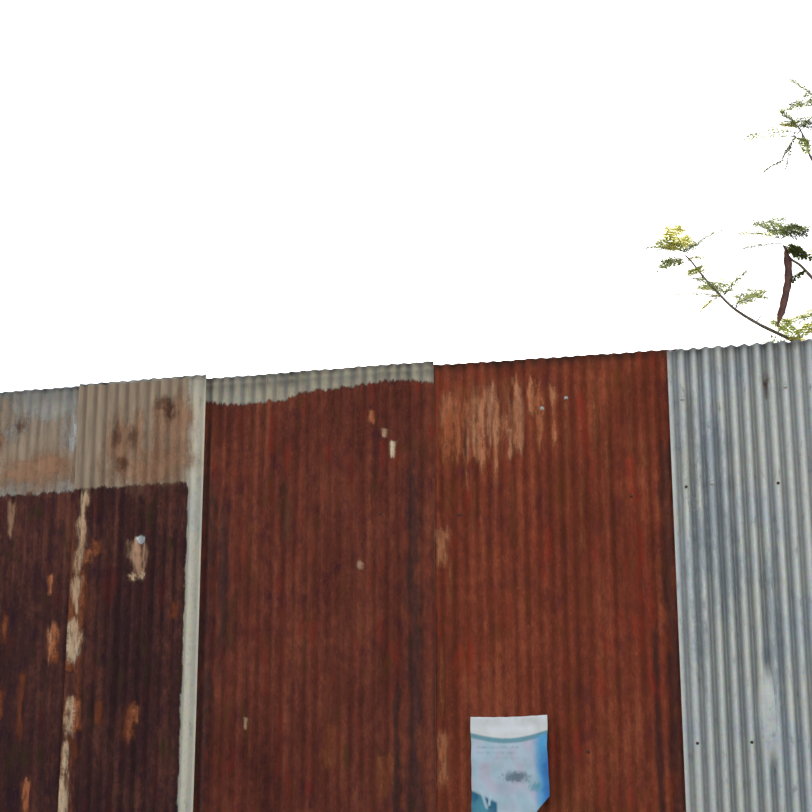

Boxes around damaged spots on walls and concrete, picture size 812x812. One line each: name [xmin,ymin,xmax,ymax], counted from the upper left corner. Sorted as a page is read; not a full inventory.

corrosion [0,378,193,812]
corrosion [193,376,557,812]